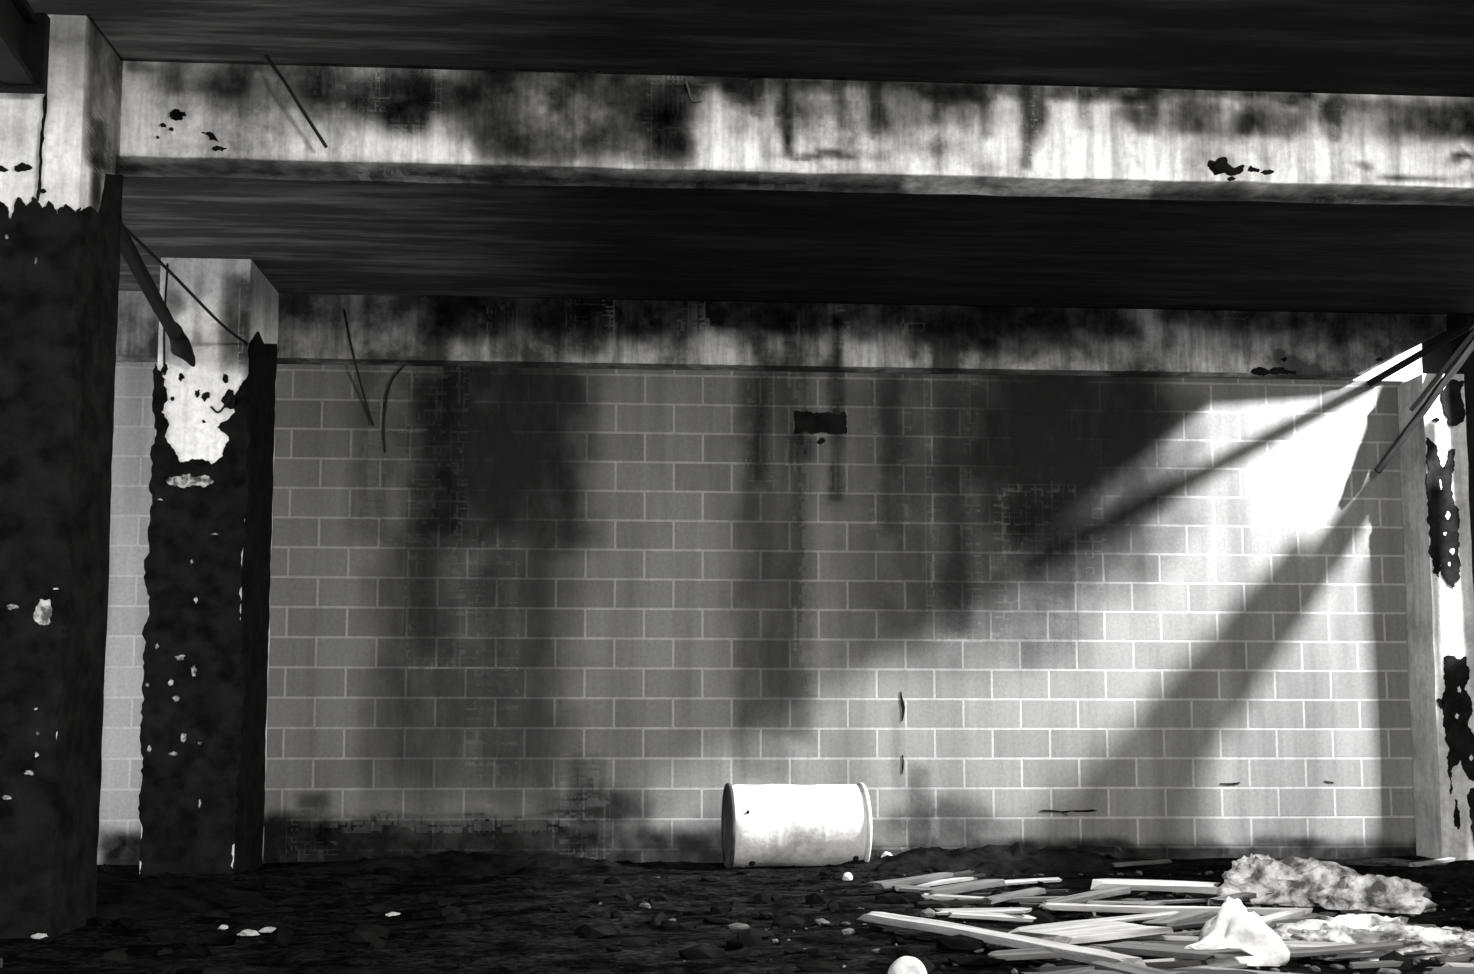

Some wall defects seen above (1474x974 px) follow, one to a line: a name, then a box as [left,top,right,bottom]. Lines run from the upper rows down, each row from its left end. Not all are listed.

leakage [382,66,432,135]
leakage [656,83,697,159]
leakage [730,75,853,158]
leakage [1124,96,1156,124]
peeling [0,162,32,172]
peeling [161,363,238,409]
peeling [157,474,214,501]
peeling [1425,379,1466,587]
peeling [1436,655,1474,838]